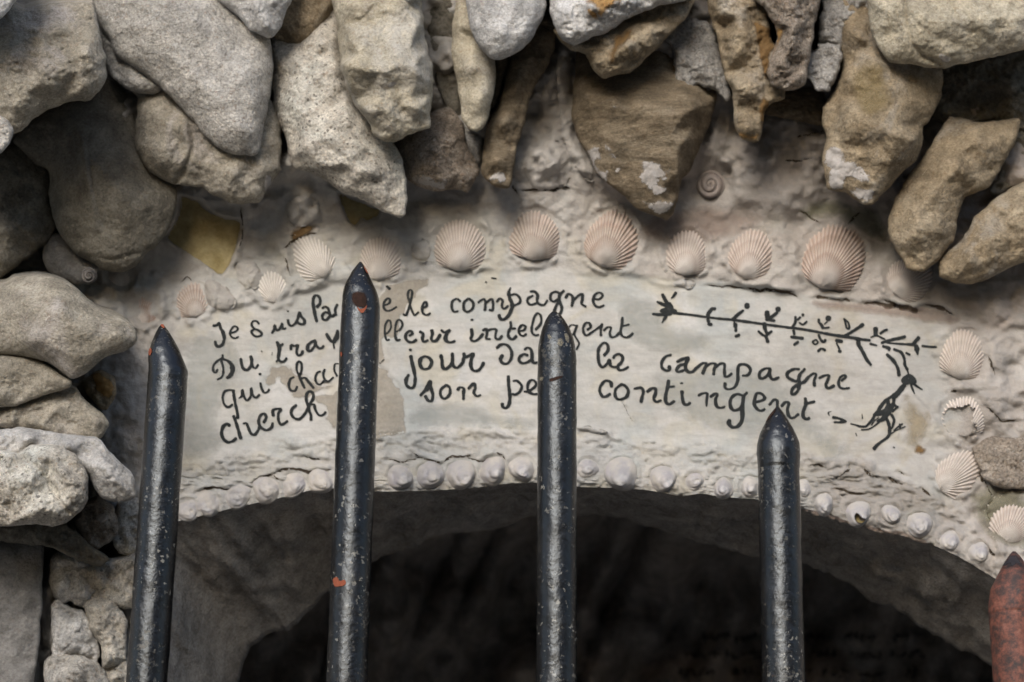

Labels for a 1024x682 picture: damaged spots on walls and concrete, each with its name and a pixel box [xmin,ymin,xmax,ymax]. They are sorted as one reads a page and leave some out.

crack [512,185,570,193]
crack [709,285,952,315]
rust [1002,552,1023,568]